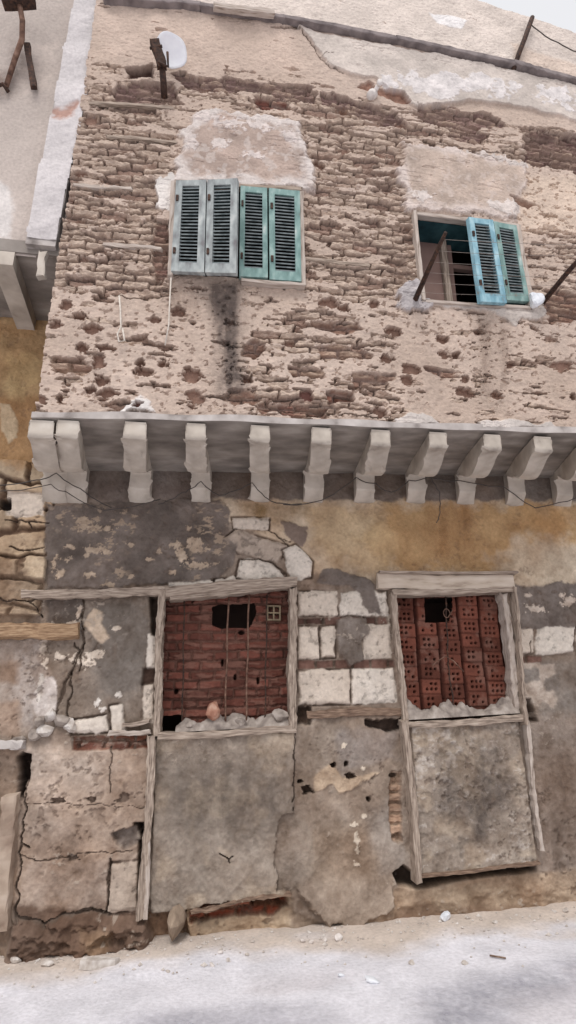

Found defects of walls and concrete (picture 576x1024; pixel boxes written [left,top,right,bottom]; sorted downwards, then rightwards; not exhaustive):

flaking render [109,25,576,175]
spalling [153,219,169,285]
spalling [48,299,121,405]
flaking render [133,357,169,377]
flaking render [183,365,206,409]
leakage [212,284,238,387]
spalling [225,296,476,419]
spalling [542,288,576,325]
flaking render [44,497,238,590]
crack [56,599,86,717]
flaking render [35,604,122,703]
crack [15,745,145,928]